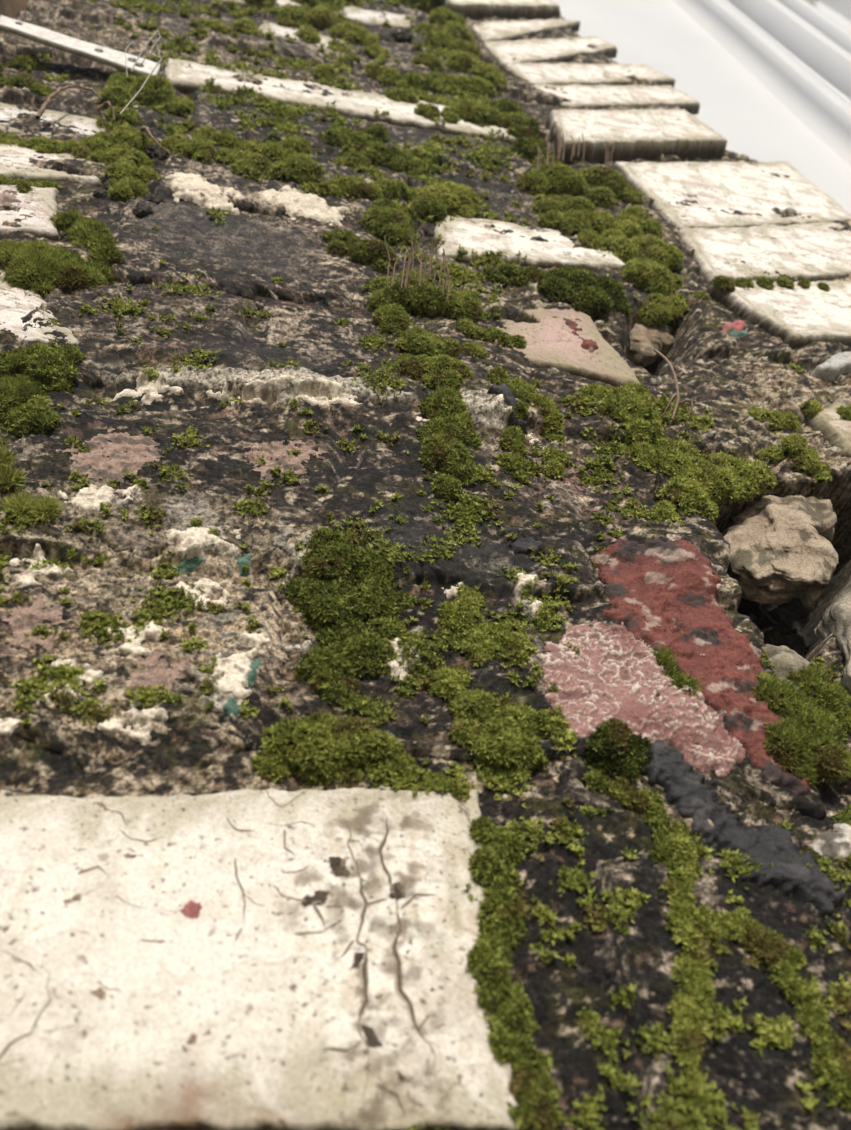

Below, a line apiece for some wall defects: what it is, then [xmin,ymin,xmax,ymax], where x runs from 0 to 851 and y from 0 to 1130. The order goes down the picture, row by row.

peeling [0,190,21,210]
crack [109,810,163,843]
crack [63,865,143,908]
crack [179,781,441,1129]
crack [0,949,78,1065]